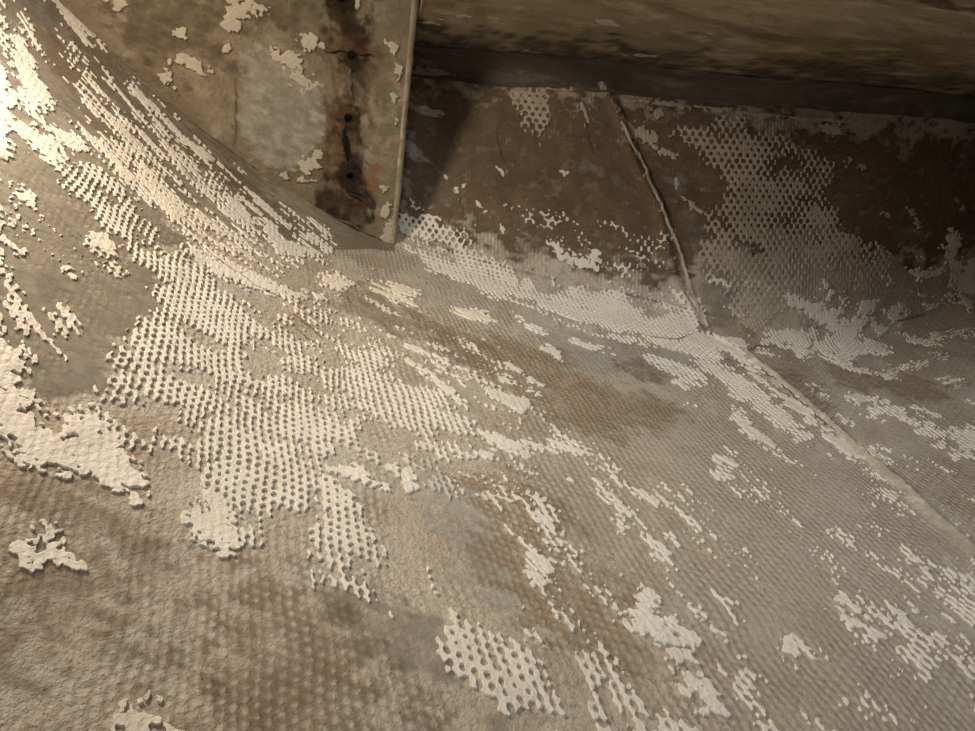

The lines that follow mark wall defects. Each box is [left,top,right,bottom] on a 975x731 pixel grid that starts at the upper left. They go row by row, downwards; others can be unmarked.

corrosion [316,0,381,91]
corrosion [315,98,378,231]
water stain [398,62,975,288]
peeling [0,0,681,604]
crack [717,345,837,432]
peeling [844,391,975,462]
peeling [110,690,185,731]
peeling [435,607,566,717]
peeling [574,649,700,731]
peeling [612,586,779,731]
peeling [781,632,817,661]
peeling [833,543,975,684]